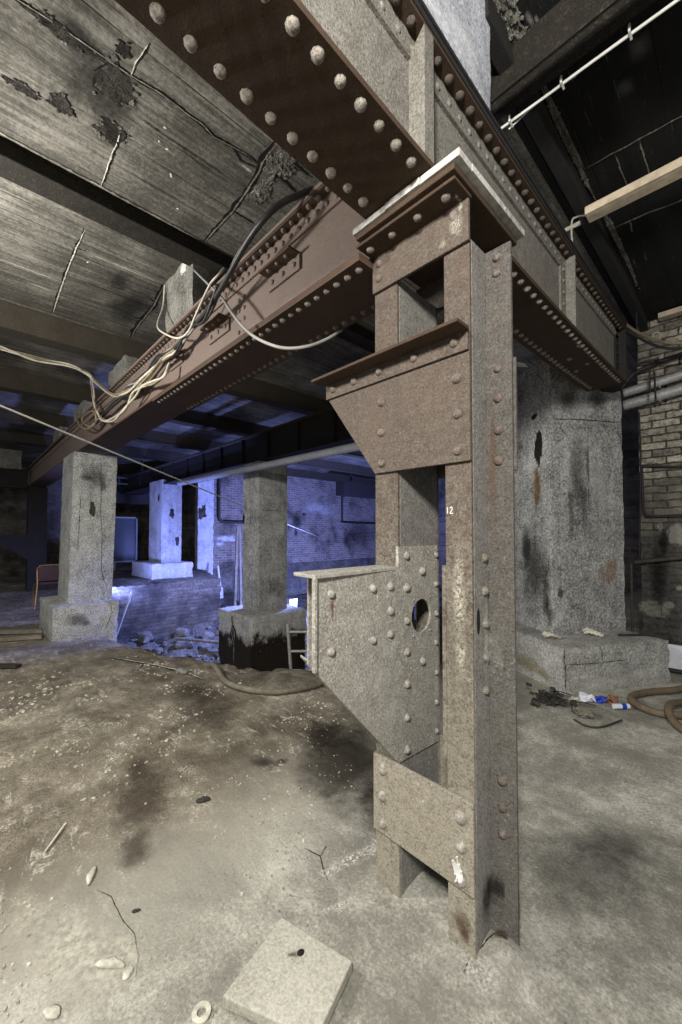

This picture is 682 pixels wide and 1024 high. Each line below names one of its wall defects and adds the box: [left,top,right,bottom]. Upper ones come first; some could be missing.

spalling [19,0,140,108]
spalling [1,74,76,118]
spalling [89,116,130,148]
crack [15,0,312,242]
crack [51,228,85,313]
spalling [530,413,543,468]
leakage [218,628,305,672]
leakage [131,764,157,812]
leakage [308,726,374,804]
crack [305,847,336,880]
leakage [483,878,504,909]
crack [98,890,139,975]